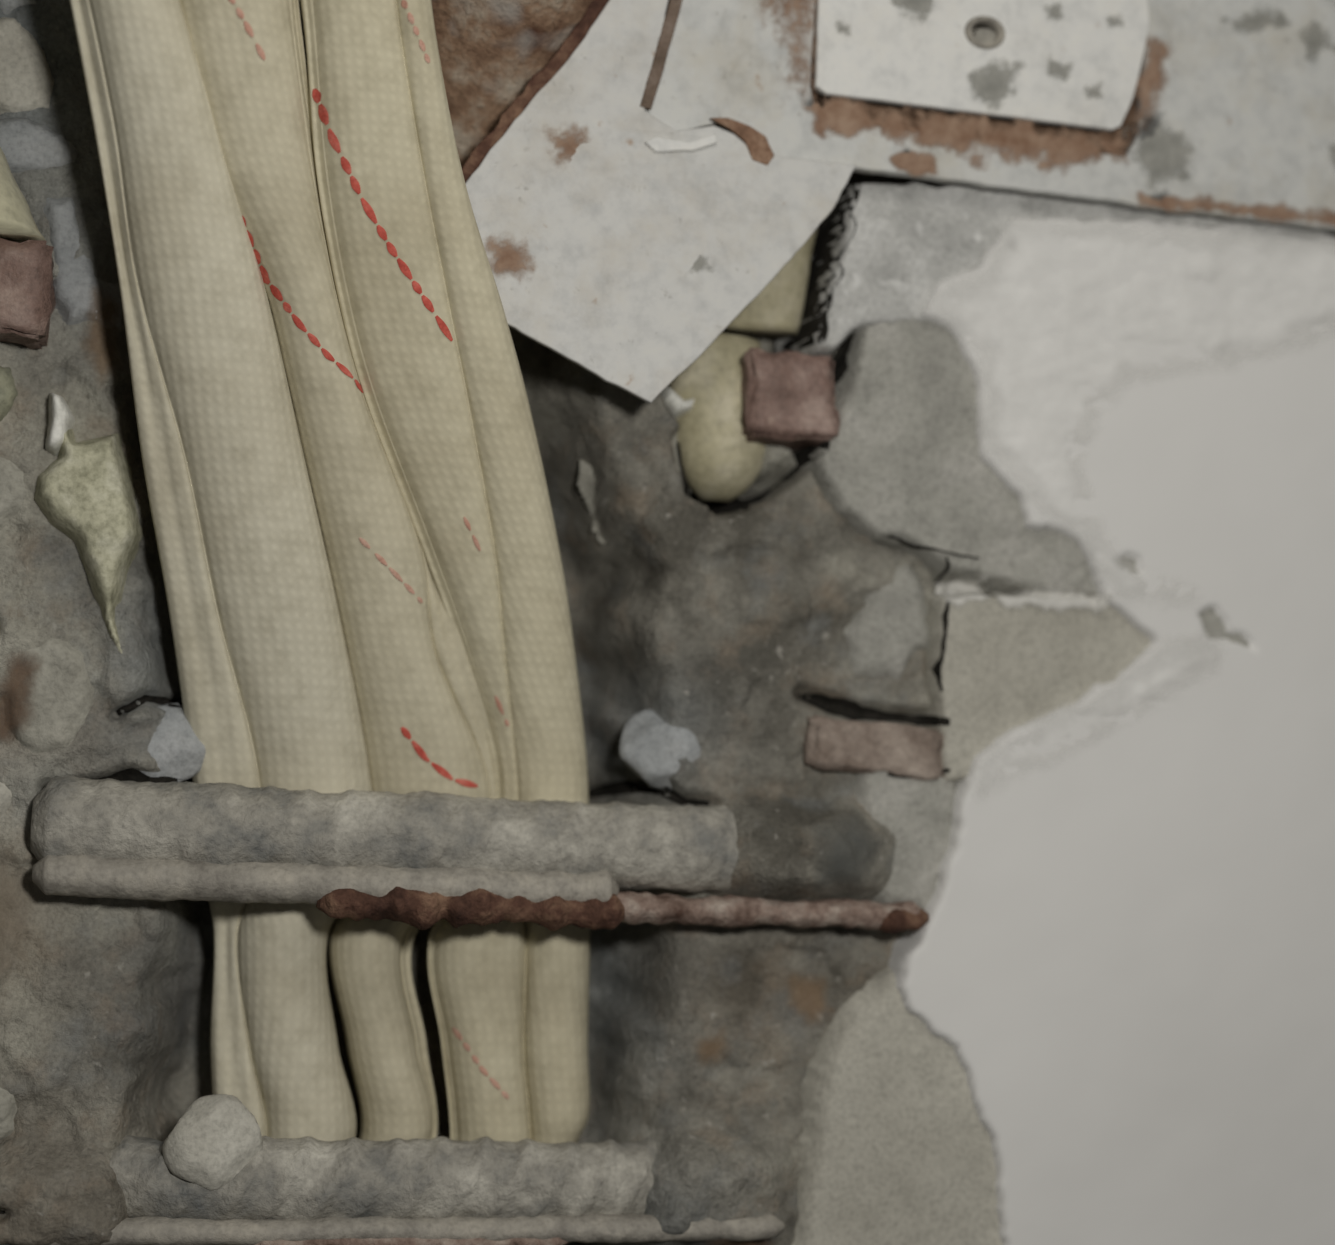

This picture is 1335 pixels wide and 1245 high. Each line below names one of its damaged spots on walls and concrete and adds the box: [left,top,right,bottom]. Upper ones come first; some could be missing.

spalling [299,0,309,81]
rust [462,0,609,183]
rust [804,38,1168,176]
rust [487,240,533,273]
rust [1138,192,1335,225]
spalling [0,0,263,1245]
crack [796,535,980,726]
spalling [509,172,1335,910]
crack [888,768,950,778]
spalling [326,928,360,1138]
spalling [411,925,450,1139]
spalling [566,922,1002,1245]